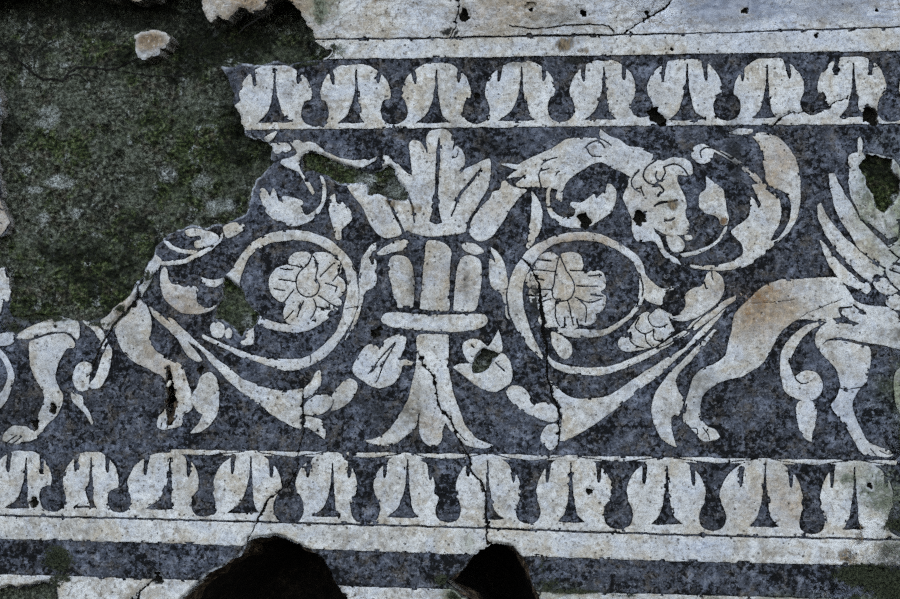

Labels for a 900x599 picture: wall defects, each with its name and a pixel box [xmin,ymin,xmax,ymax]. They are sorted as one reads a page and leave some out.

crack [509,0,672,34]
flaking render [0,0,331,336]
flaking render [858,155,900,213]
crack [248,389,319,541]
crack [418,352,490,541]
crack [524,260,561,451]